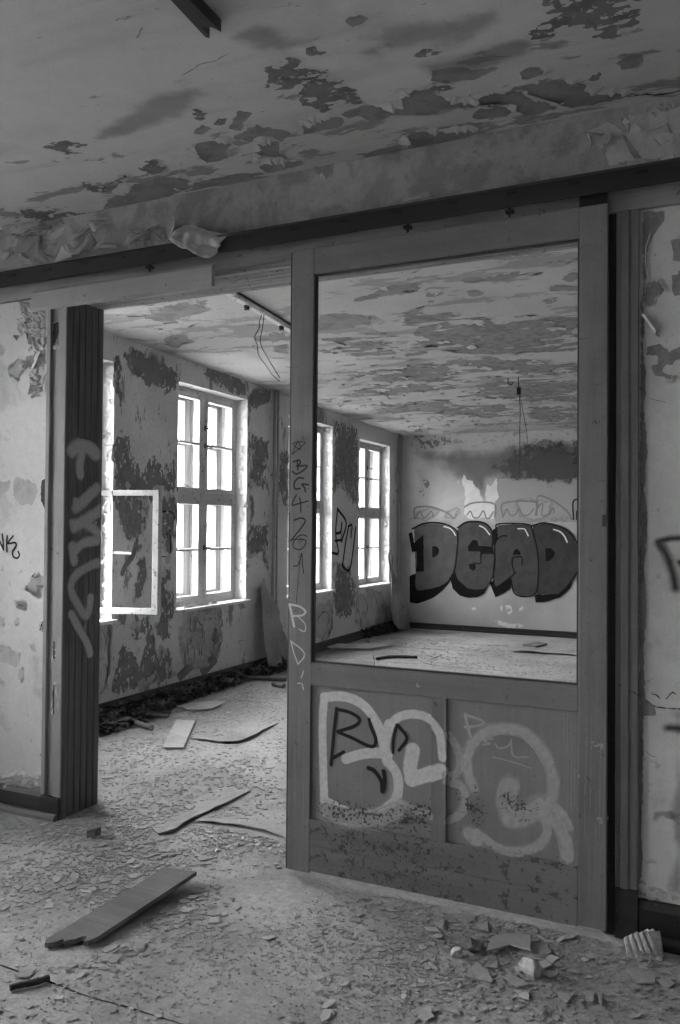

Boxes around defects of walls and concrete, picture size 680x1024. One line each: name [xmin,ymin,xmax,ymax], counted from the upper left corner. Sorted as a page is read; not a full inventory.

peeling [13,46,638,223]
peeling [345,15,368,27]
peeling [525,0,641,40]
peeling [617,54,647,70]
peeling [0,344,27,382]
peeling [99,298,218,694]
peeling [204,313,290,592]
peeling [316,258,578,632]
leakage [441,441,577,488]
peeling [638,211,680,894]